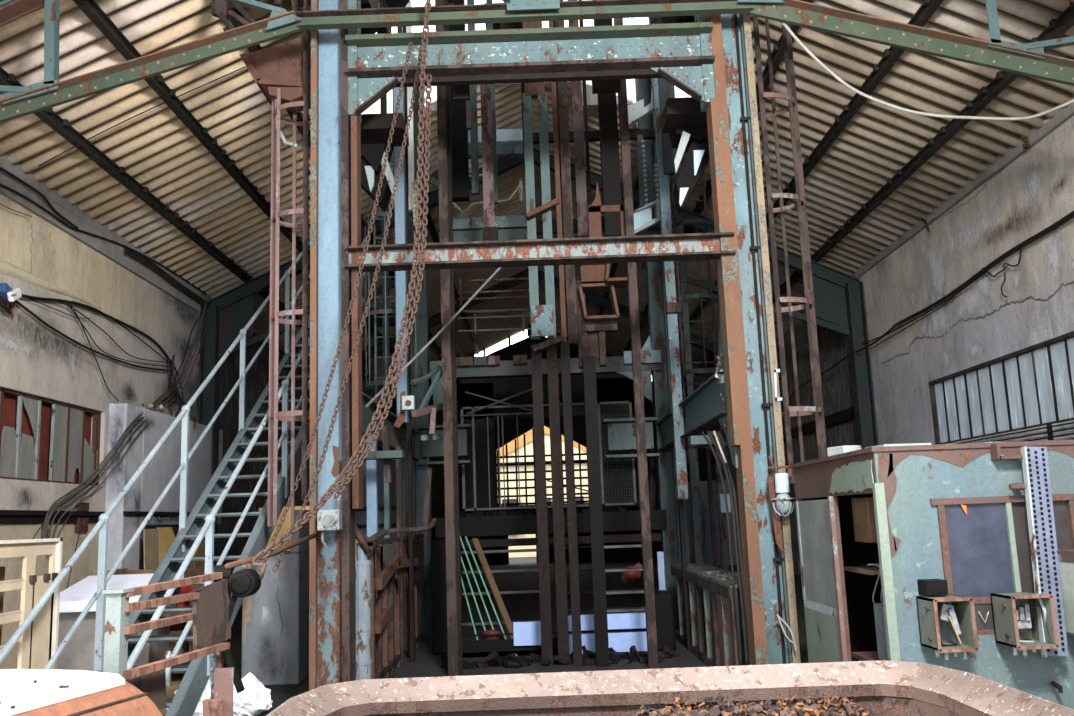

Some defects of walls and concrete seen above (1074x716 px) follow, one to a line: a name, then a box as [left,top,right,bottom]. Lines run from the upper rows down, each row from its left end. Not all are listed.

crack [880,281,1074,364]